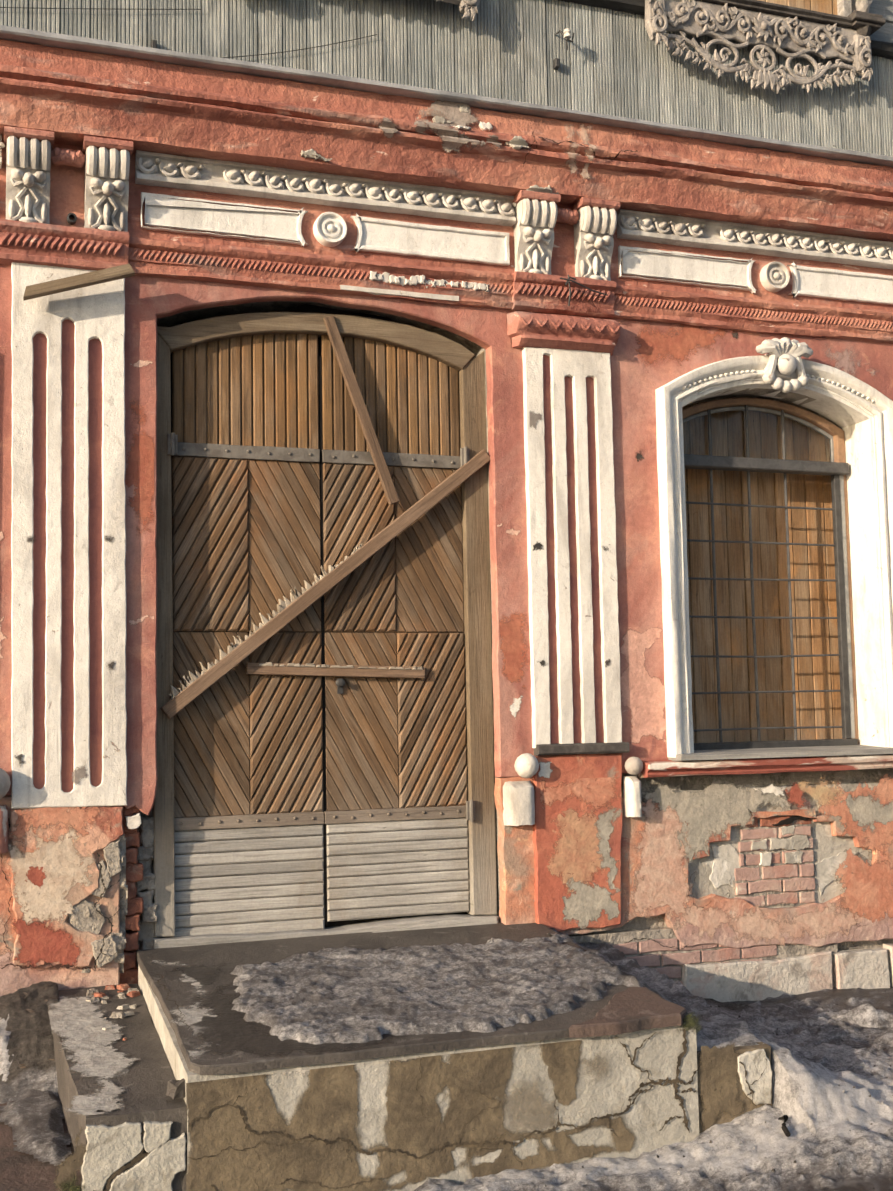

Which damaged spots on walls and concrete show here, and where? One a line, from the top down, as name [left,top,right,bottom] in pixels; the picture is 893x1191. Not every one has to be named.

peeling [379,118,398,138]
peeling [414,100,501,152]
peeling [340,271,489,302]
peeling [0,806,128,973]
flaking render [538,762,893,947]
crack [104,1029,698,1191]